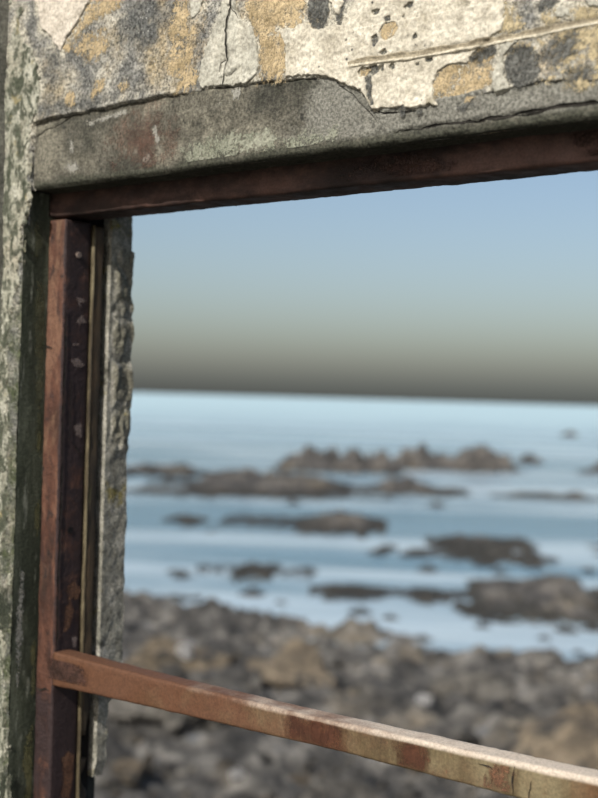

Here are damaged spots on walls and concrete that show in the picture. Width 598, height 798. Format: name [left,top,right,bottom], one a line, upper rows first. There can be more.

flaking render [34,0,91,52]
flaking render [189,0,204,19]
crack [217,0,238,89]
flaking render [198,0,259,89]
flaking render [280,0,592,116]
damp [0,572,36,695]
corrosion [48,658,87,687]
corrosion [285,715,341,750]
corrosion [397,743,429,771]
corrosion [484,765,510,793]